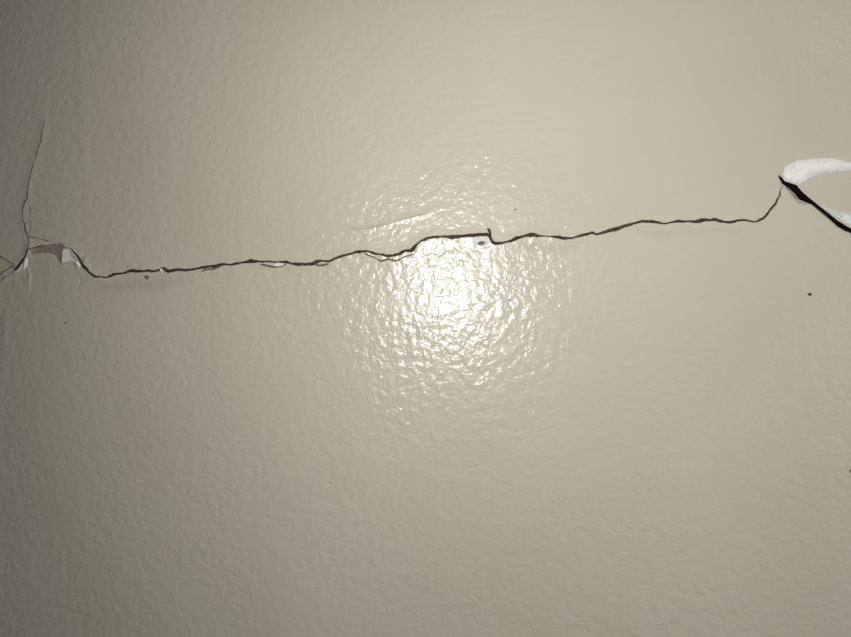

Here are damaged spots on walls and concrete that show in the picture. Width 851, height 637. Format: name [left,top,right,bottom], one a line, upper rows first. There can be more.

peeling [782,158,851,185]
crack [0,122,851,291]
spalling [816,203,851,226]
spalling [29,242,89,268]